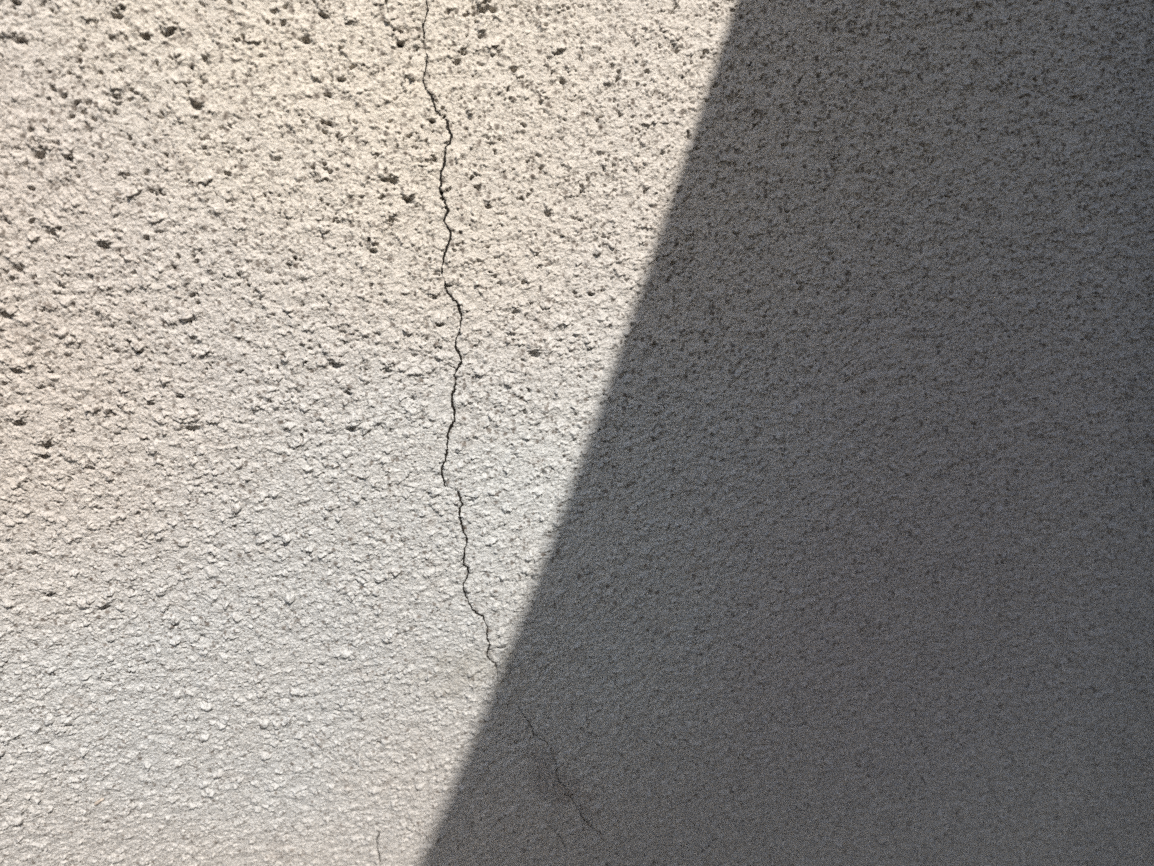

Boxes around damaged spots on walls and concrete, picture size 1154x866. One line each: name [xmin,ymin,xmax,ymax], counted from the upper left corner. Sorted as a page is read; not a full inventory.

crack [422,1,598,834]